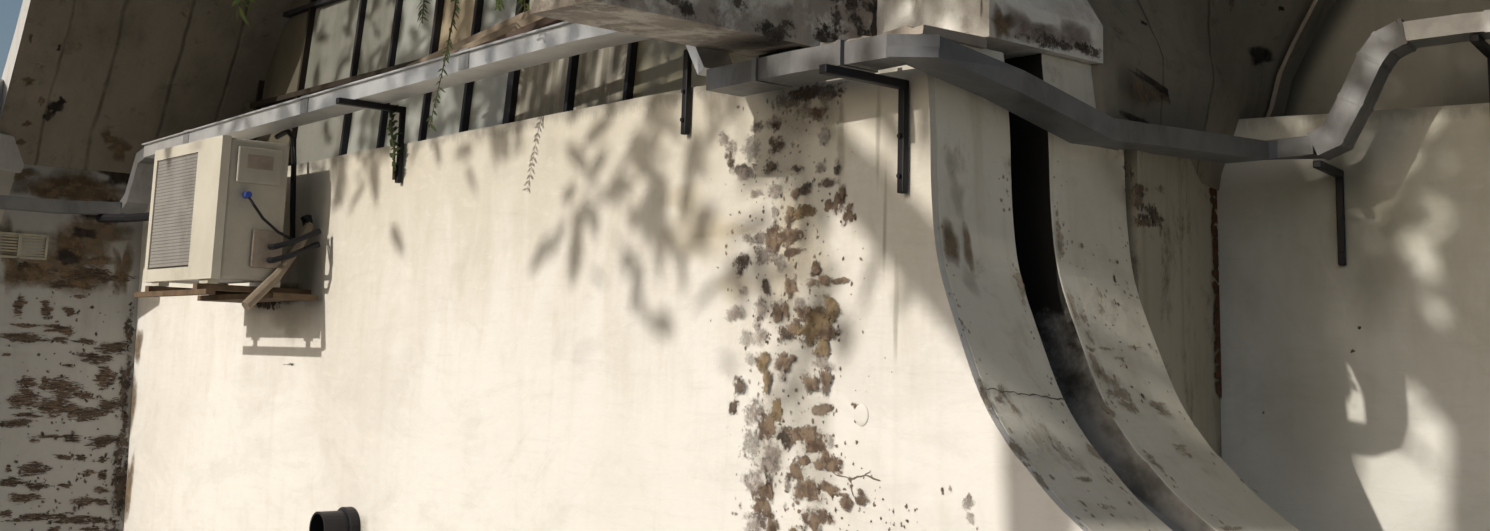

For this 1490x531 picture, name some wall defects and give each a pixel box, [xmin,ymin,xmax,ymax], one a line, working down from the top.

peeling [0,263,136,531]
peeling [710,83,917,531]
peeling [941,486,978,530]
spalling [978,359,1055,490]
peeling [1055,162,1185,422]